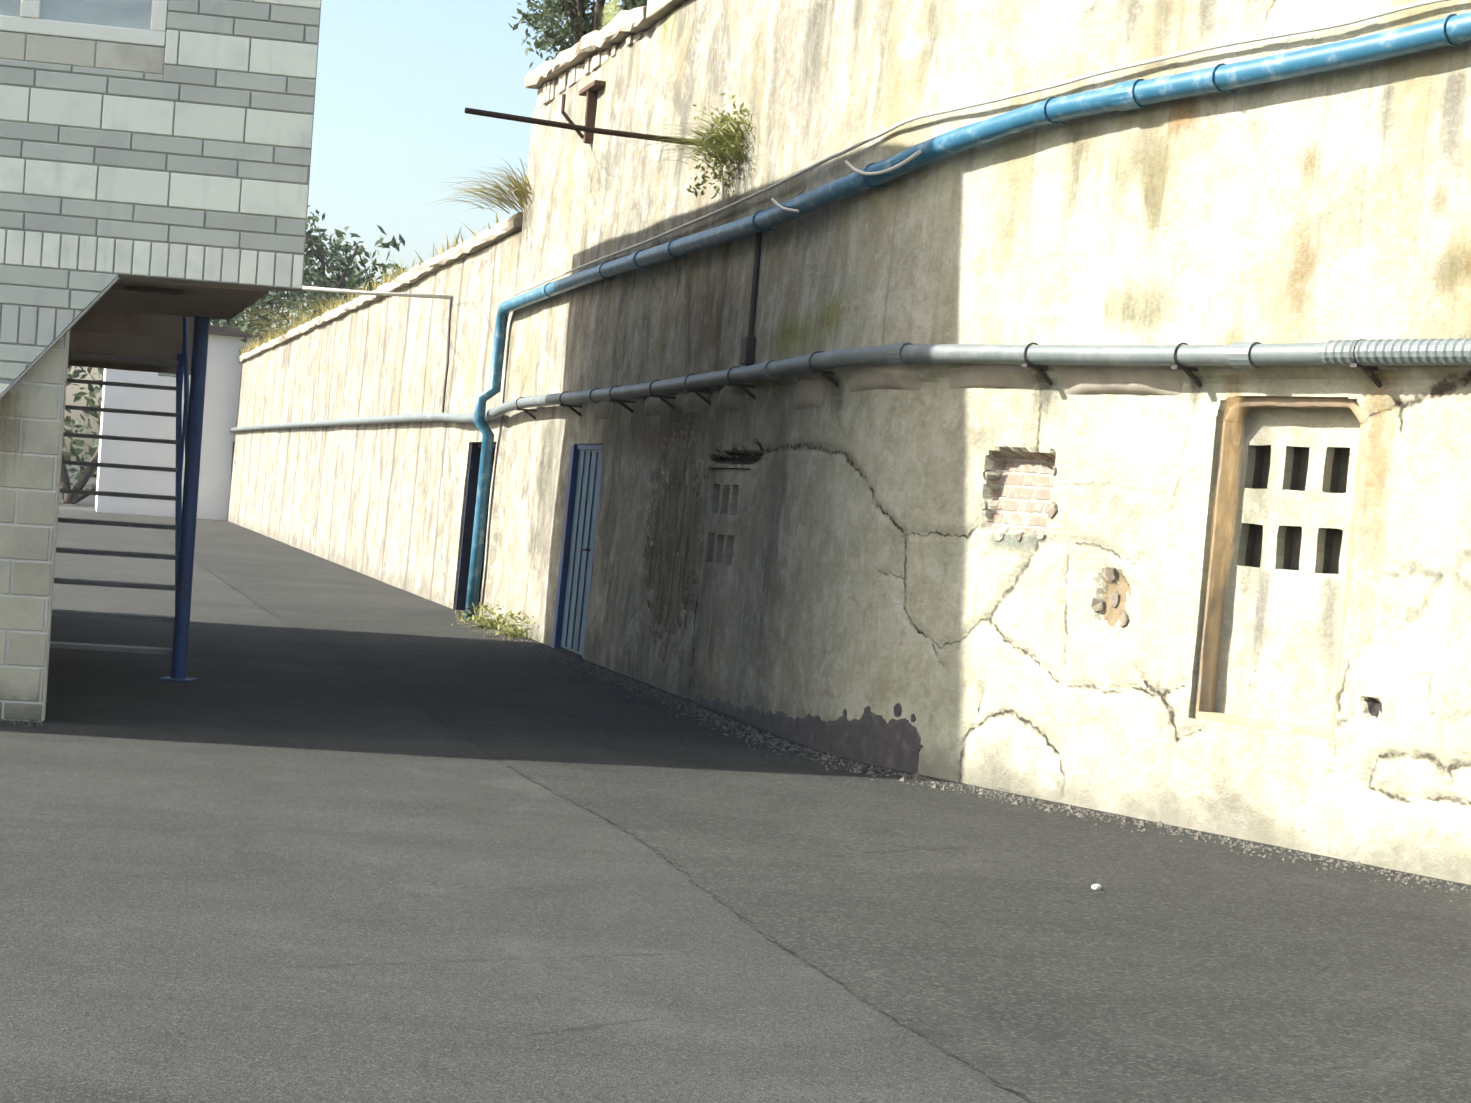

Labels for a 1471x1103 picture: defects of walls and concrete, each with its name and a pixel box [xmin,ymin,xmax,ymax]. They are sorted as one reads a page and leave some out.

crack [1360,370,1471,431]
spalling [980,448,1058,542]
crack [763,444,1201,742]
spalling [1091,566,1131,629]
crack [959,690,1065,795]
crack [1334,653,1349,753]
spalling [1364,698,1382,718]
crack [1368,753,1471,805]